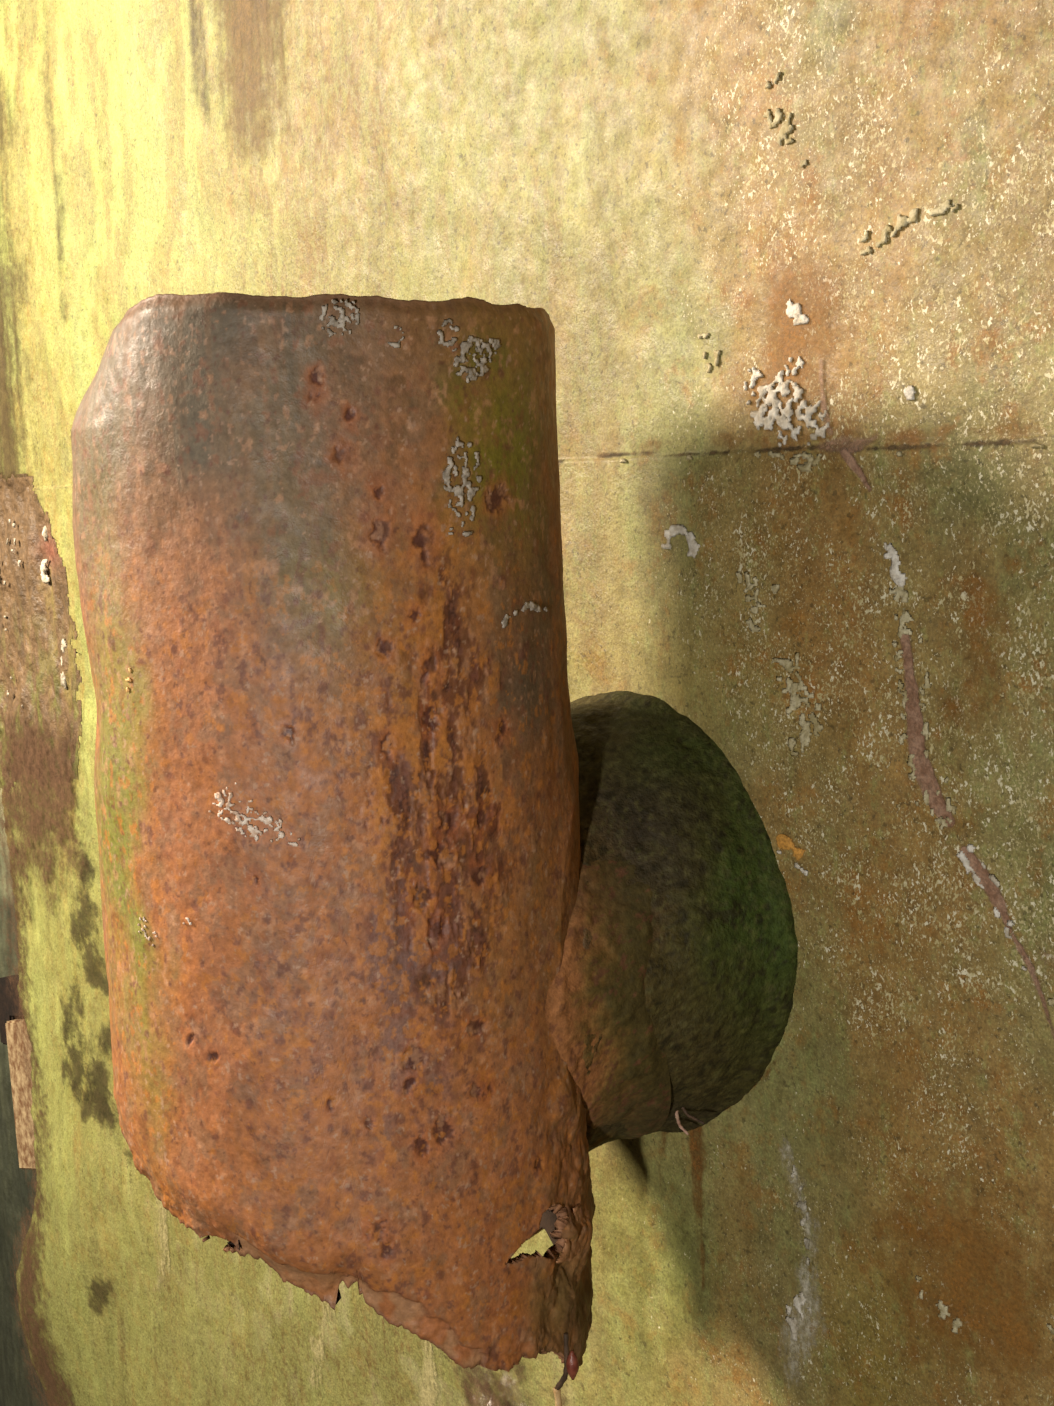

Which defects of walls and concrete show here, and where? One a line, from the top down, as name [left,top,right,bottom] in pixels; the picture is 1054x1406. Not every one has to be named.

crack [598,361,929,491]
crack [964,439,1045,449]
spalling [0,473,114,1128]
peeling [89,1279,112,1313]
water stain [783,1146,818,1374]